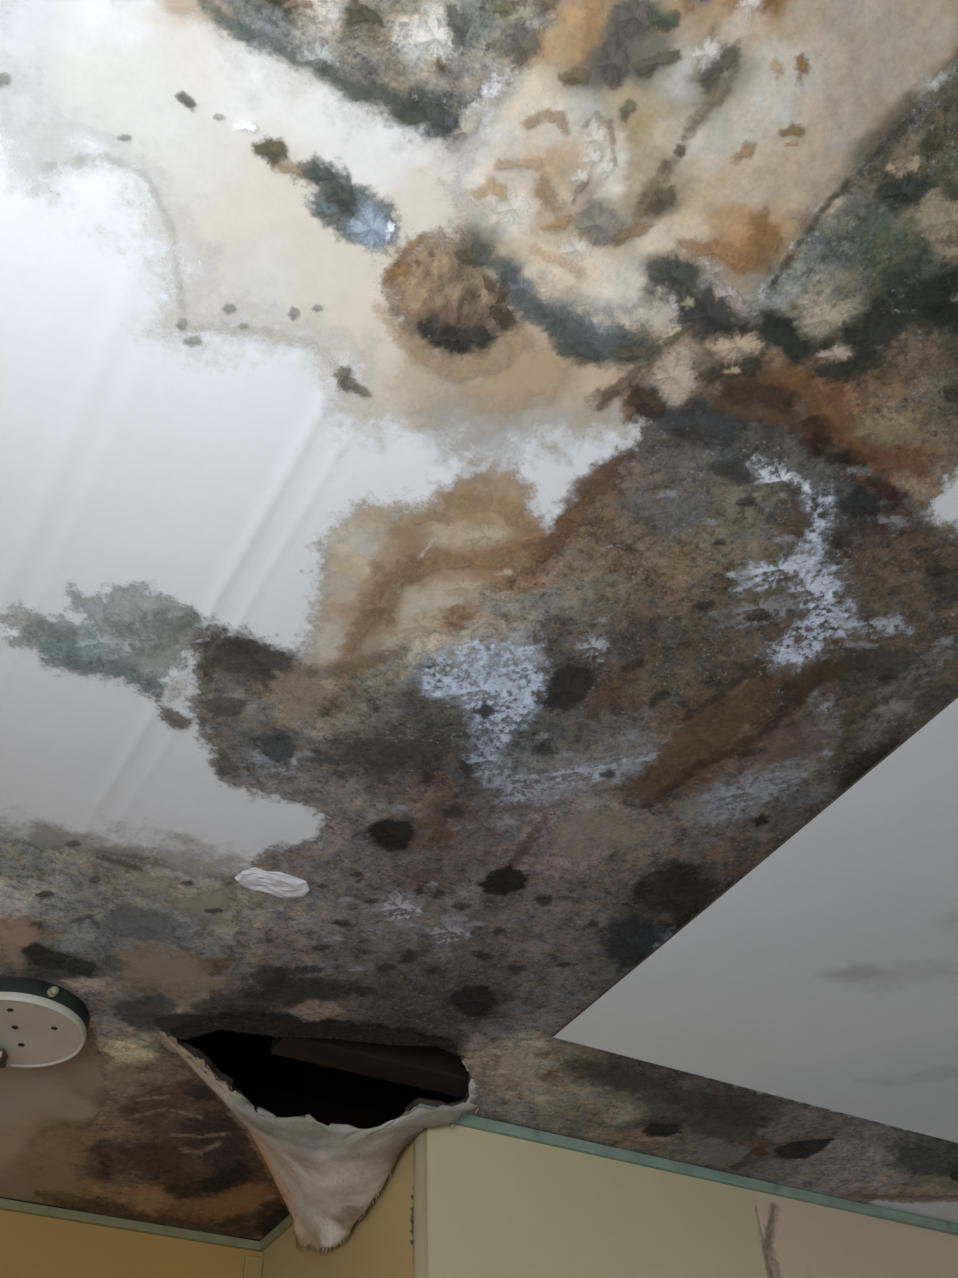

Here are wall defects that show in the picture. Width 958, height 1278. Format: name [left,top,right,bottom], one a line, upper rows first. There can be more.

leakage [0,0,958,512]
leakage [0,406,958,1240]